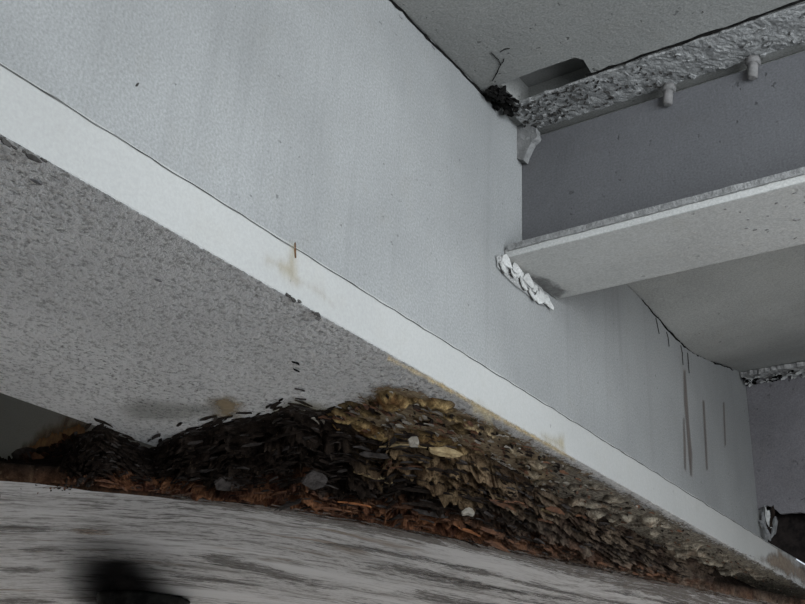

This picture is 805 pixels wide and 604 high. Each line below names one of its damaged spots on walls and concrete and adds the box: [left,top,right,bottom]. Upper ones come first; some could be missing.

crack [389,0,510,105]
spalling [484,66,696,130]
peeling [496,254,554,310]
crack [642,300,732,373]
spalling [742,369,805,387]
rust [22,380,805,604]
peeling [759,505,778,541]